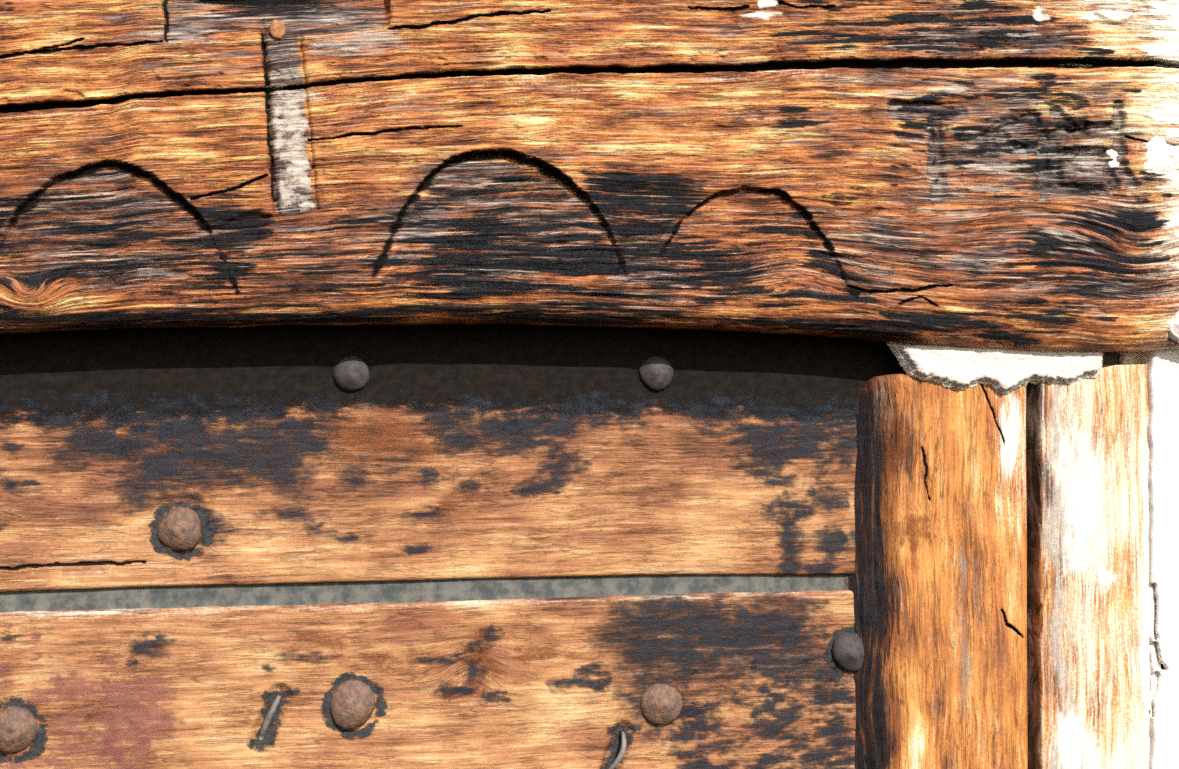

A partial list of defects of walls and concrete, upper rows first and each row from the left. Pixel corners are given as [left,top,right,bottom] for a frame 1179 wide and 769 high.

crack [0,33,1179,202]
crack [980,384,1005,445]
rust [148,501,216,561]
crack [0,561,146,570]
rust [0,697,48,763]